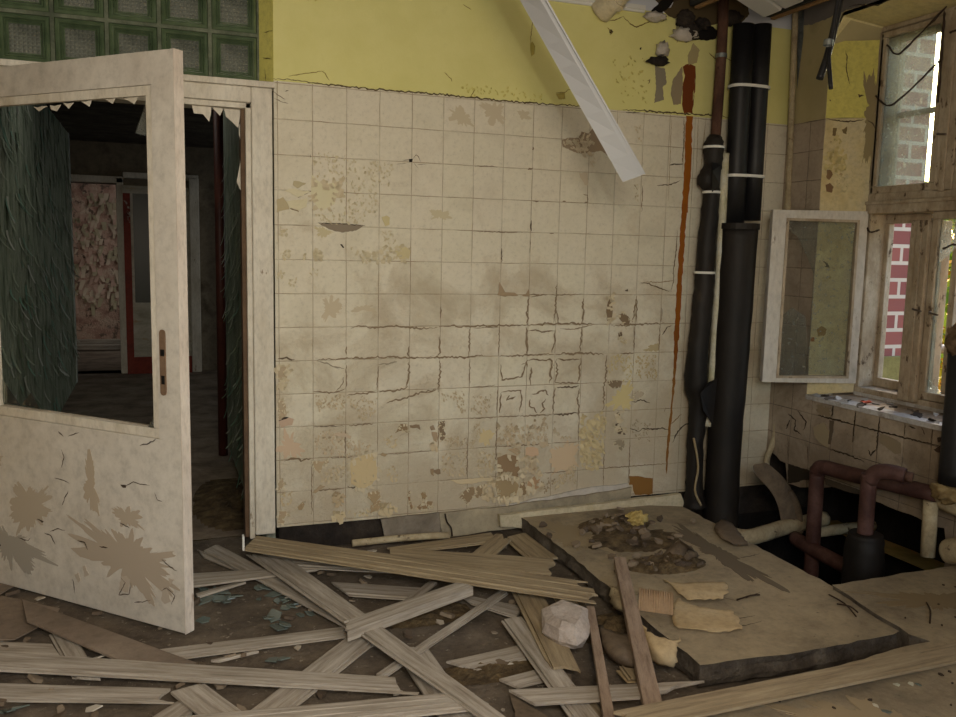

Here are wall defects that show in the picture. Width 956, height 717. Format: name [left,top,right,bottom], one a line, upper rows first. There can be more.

spalling [651,0,749,105]
spalling [562,128,608,156]
crack [473,201,554,260]
corrosion [666,64,696,474]
crack [286,423,372,515]
peeling [346,450,387,515]
spalling [395,420,448,442]
spalling [451,448,545,506]
corrosion [629,476,653,495]
crack [602,399,688,485]